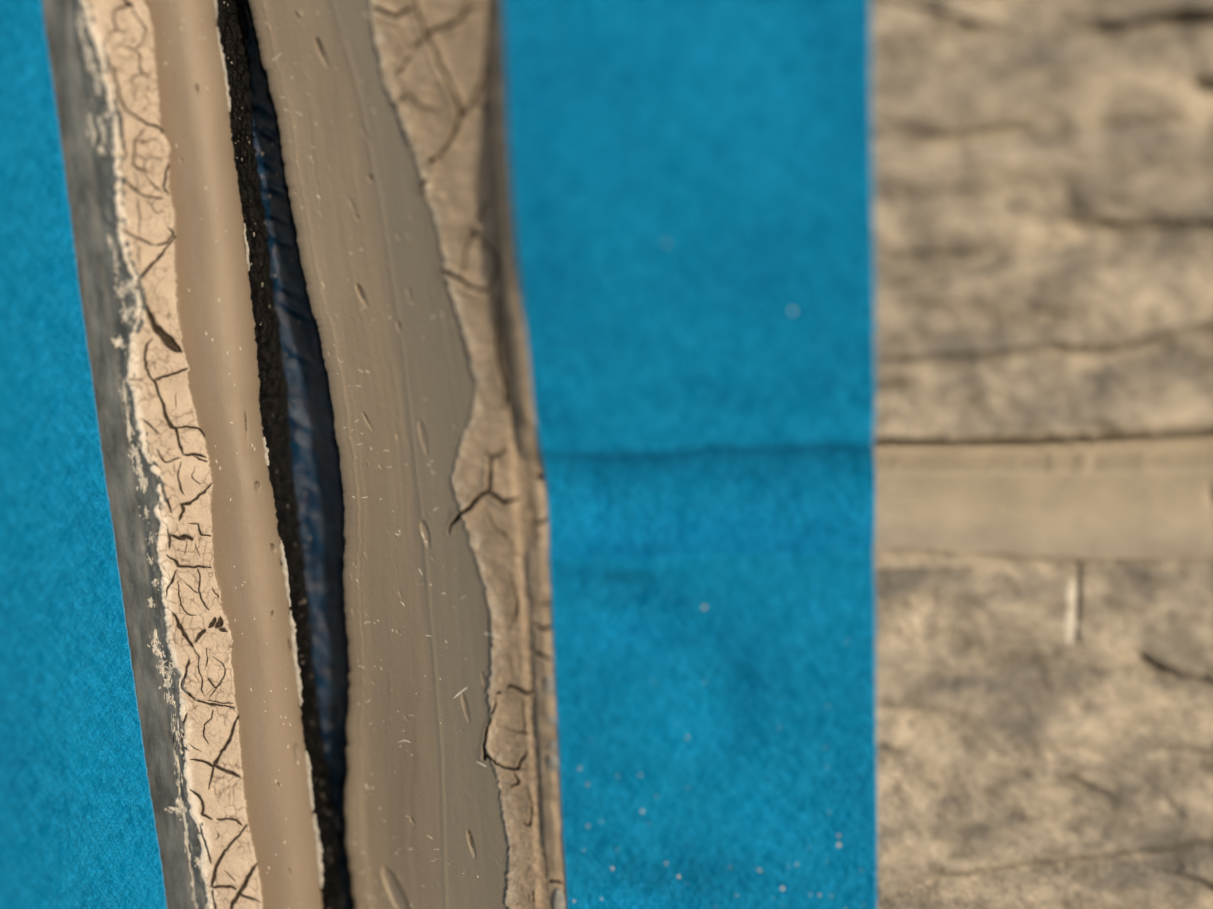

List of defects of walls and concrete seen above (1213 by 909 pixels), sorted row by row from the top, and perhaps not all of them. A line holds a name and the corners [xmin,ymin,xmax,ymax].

crack [81,0,263,909]
crack [363,0,561,909]